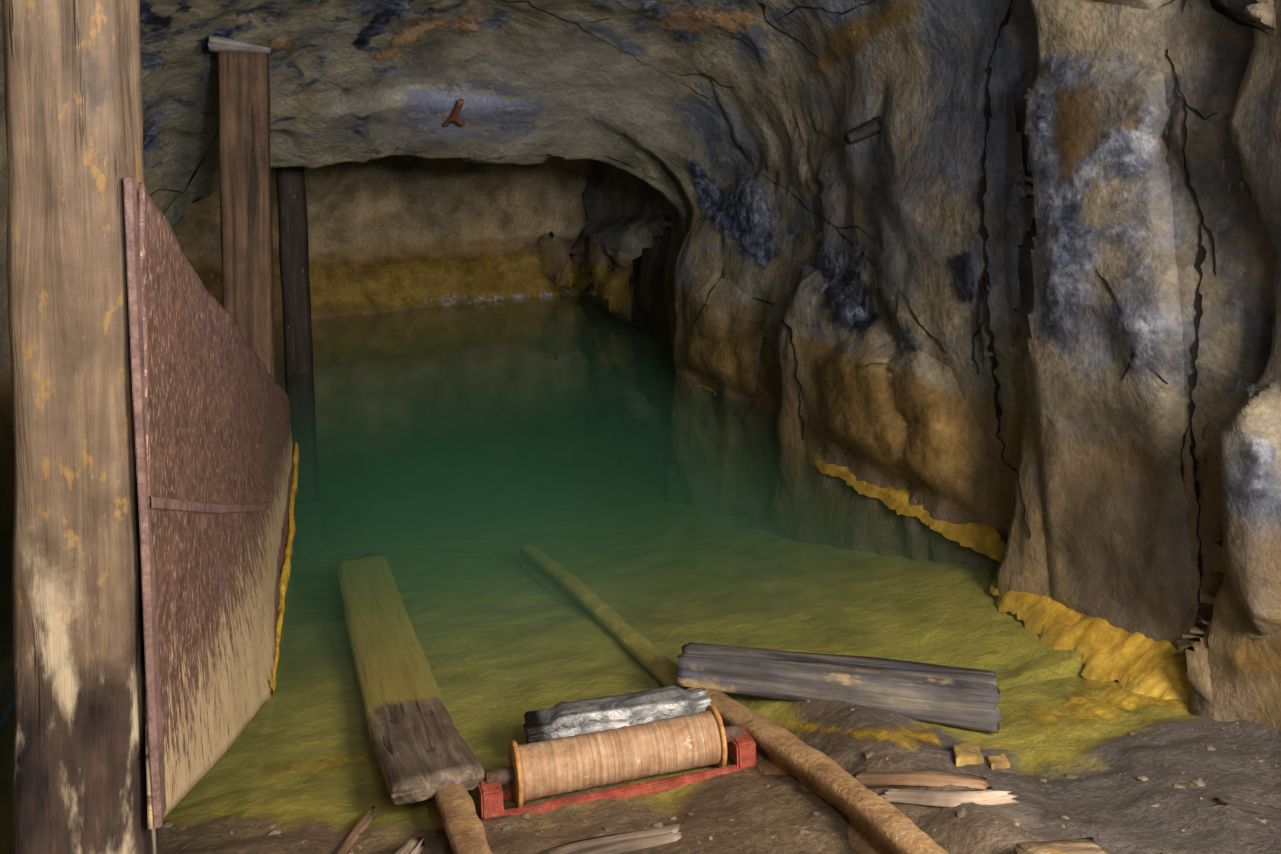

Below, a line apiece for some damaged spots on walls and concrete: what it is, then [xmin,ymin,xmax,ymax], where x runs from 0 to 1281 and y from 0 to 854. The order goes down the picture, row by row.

crack [759,0,1031,538]
crack [1094,264,1121,311]
crack [1122,49,1217,648]
leakage [989,578,1192,725]